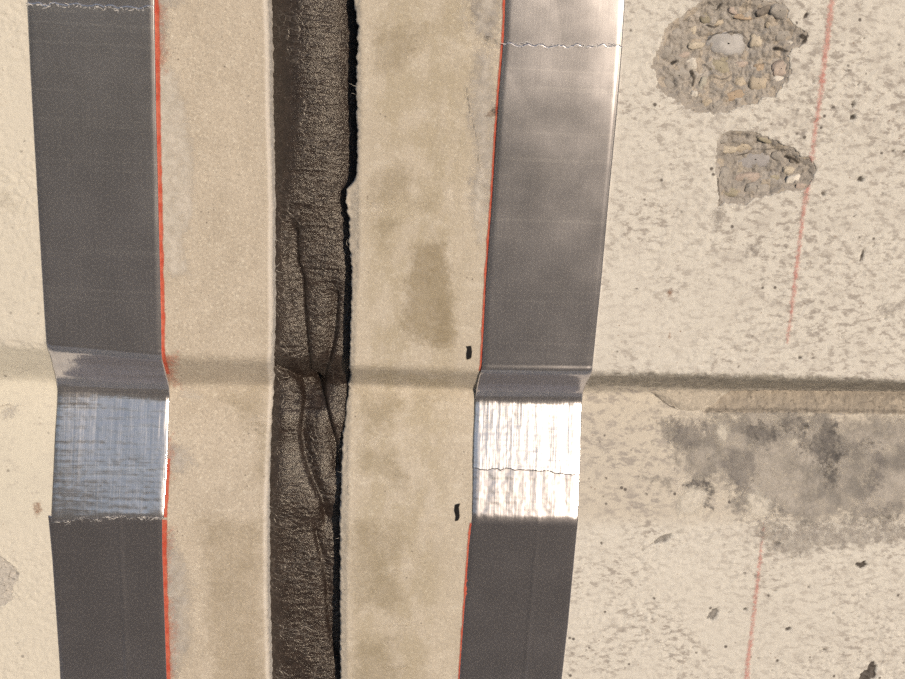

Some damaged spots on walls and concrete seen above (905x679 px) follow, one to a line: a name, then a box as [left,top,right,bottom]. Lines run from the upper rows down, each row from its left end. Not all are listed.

spalling [651,0,807,115]
spalling [715,131,816,206]
leakage [663,412,905,556]
spalling [0,557,19,605]